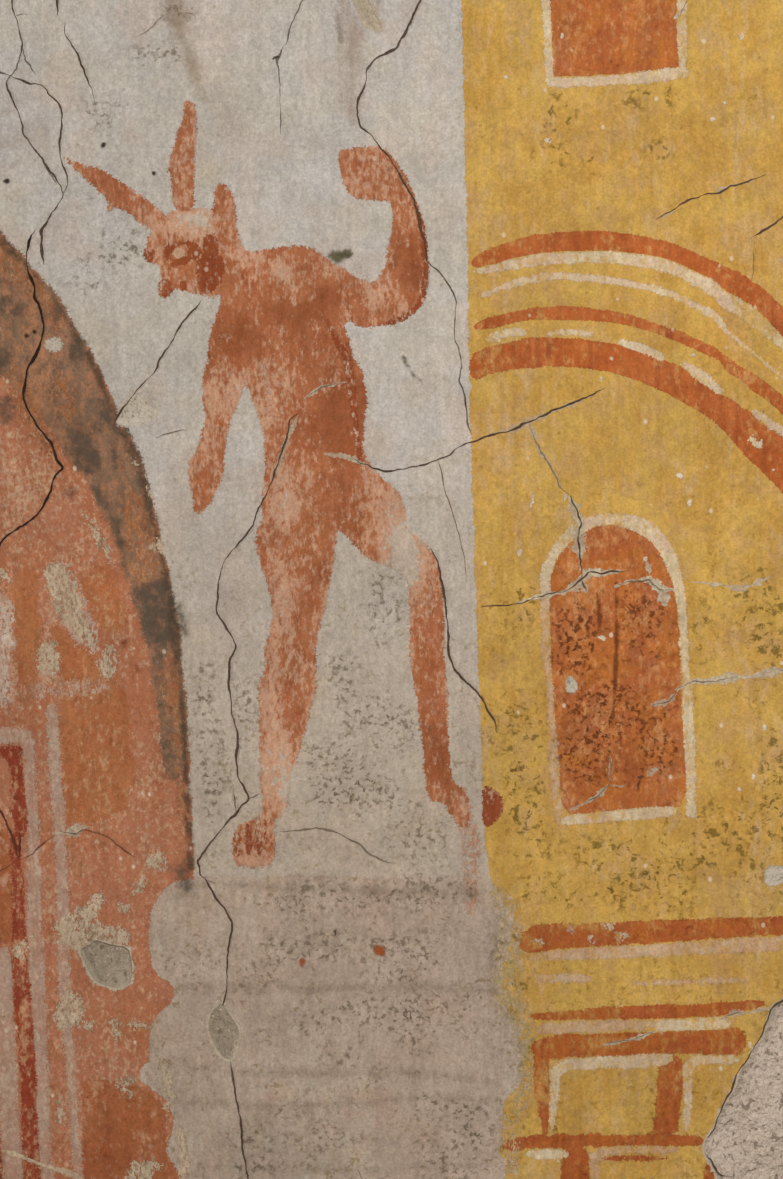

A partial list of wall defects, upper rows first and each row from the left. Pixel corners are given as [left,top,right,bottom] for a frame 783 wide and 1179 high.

crack [56,0,95,102]
crack [0,0,68,546]
crack [324,0,783,733]
crack [197,381,345,1005]
crack [573,756,658,810]
peeling [51,849,168,992]
flaking render [765,866,783,885]
peeling [50,989,161,1043]
peeling [124,1123,193,1179]
flaking render [205,1001,242,1062]
crack [230,1059,249,1179]
flaking render [702,998,783,1179]